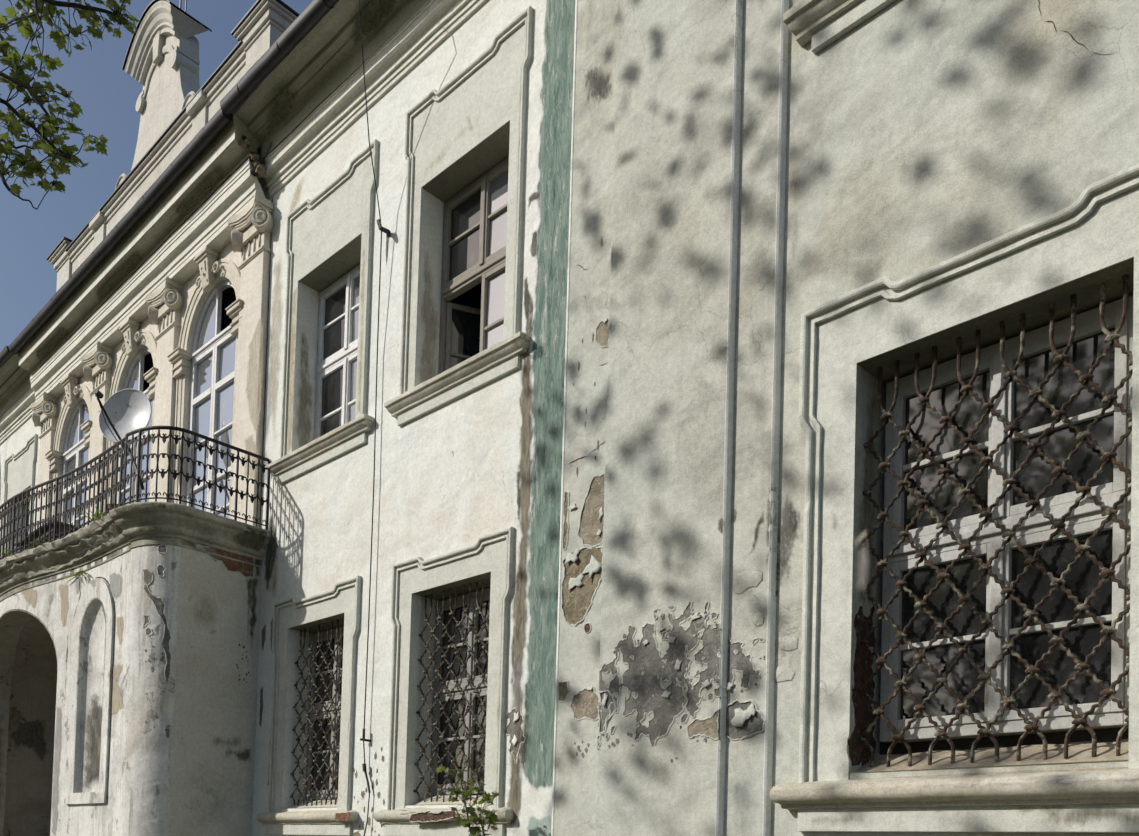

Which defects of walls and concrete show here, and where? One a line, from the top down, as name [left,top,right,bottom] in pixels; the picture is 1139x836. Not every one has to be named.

crack [1038,0,1116,55]
flaking render [582,318,609,349]
leakage [508,0,611,836]
leakage [0,707,62,835]
leakage [83,665,123,788]
flaking render [143,544,172,692]
flaking render [202,546,254,578]
peeling [335,747,385,836]
flaking render [399,807,503,823]
spalling [561,473,605,634]
flaking render [558,600,766,758]
leakage [753,488,799,574]